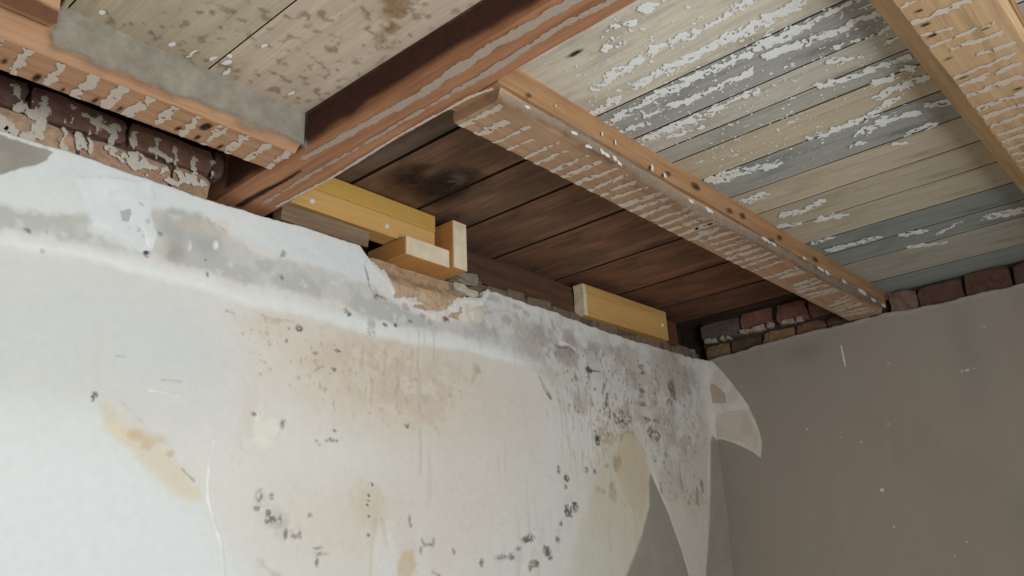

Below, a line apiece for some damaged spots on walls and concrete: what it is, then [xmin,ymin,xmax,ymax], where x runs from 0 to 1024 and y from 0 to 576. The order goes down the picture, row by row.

flaking render [0,75,224,254]
leakage [226,156,262,188]
leakage [262,0,617,207]
leakage [85,327,205,509]
leakage [342,302,450,392]
leakage [406,514,436,557]
leakage [477,324,762,573]
flaking render [368,258,1024,374]